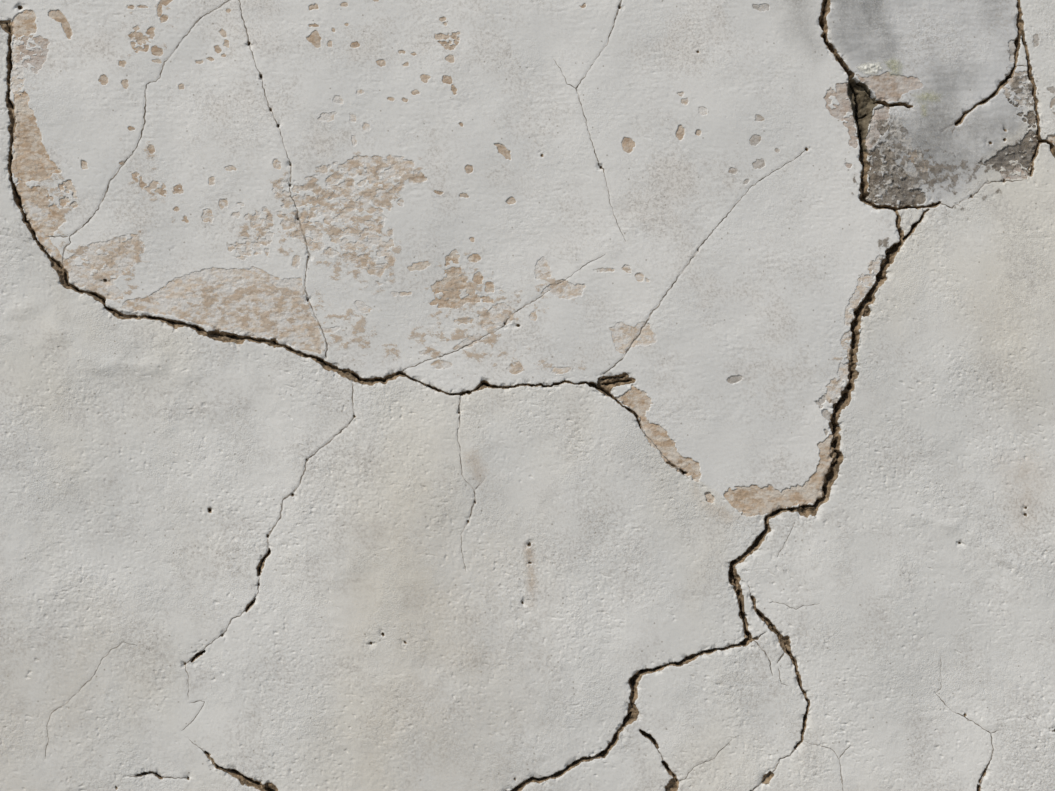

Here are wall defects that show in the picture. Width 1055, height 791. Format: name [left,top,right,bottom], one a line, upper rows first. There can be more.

peeling [11,0,443,356]
peeling [387,74,457,102]
peeling [434,17,460,63]
peeling [494,143,511,160]
spalling [824,40,1055,207]
crack [0,0,808,791]
peeling [411,237,585,375]
peeling [609,322,657,354]
peeling [615,385,701,482]
crack [510,0,1055,791]
peeling [705,237,889,517]